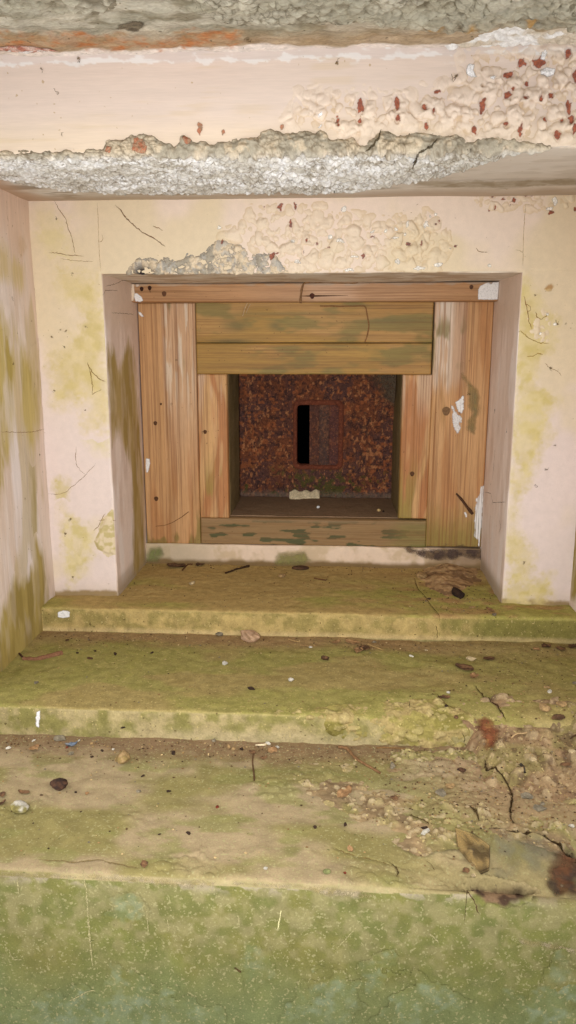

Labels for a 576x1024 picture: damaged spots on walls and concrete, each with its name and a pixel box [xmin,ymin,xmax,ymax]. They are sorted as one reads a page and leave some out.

corrosion [0,25,250,55]
spalling [0,122,551,196]
crack [412,139,437,170]
crack [52,202,93,262]
crack [116,206,163,245]
spalling [126,240,300,275]
spalling [238,691,477,772]
spalling [293,760,575,857]
crack [464,761,570,857]
spalling [462,874,540,909]